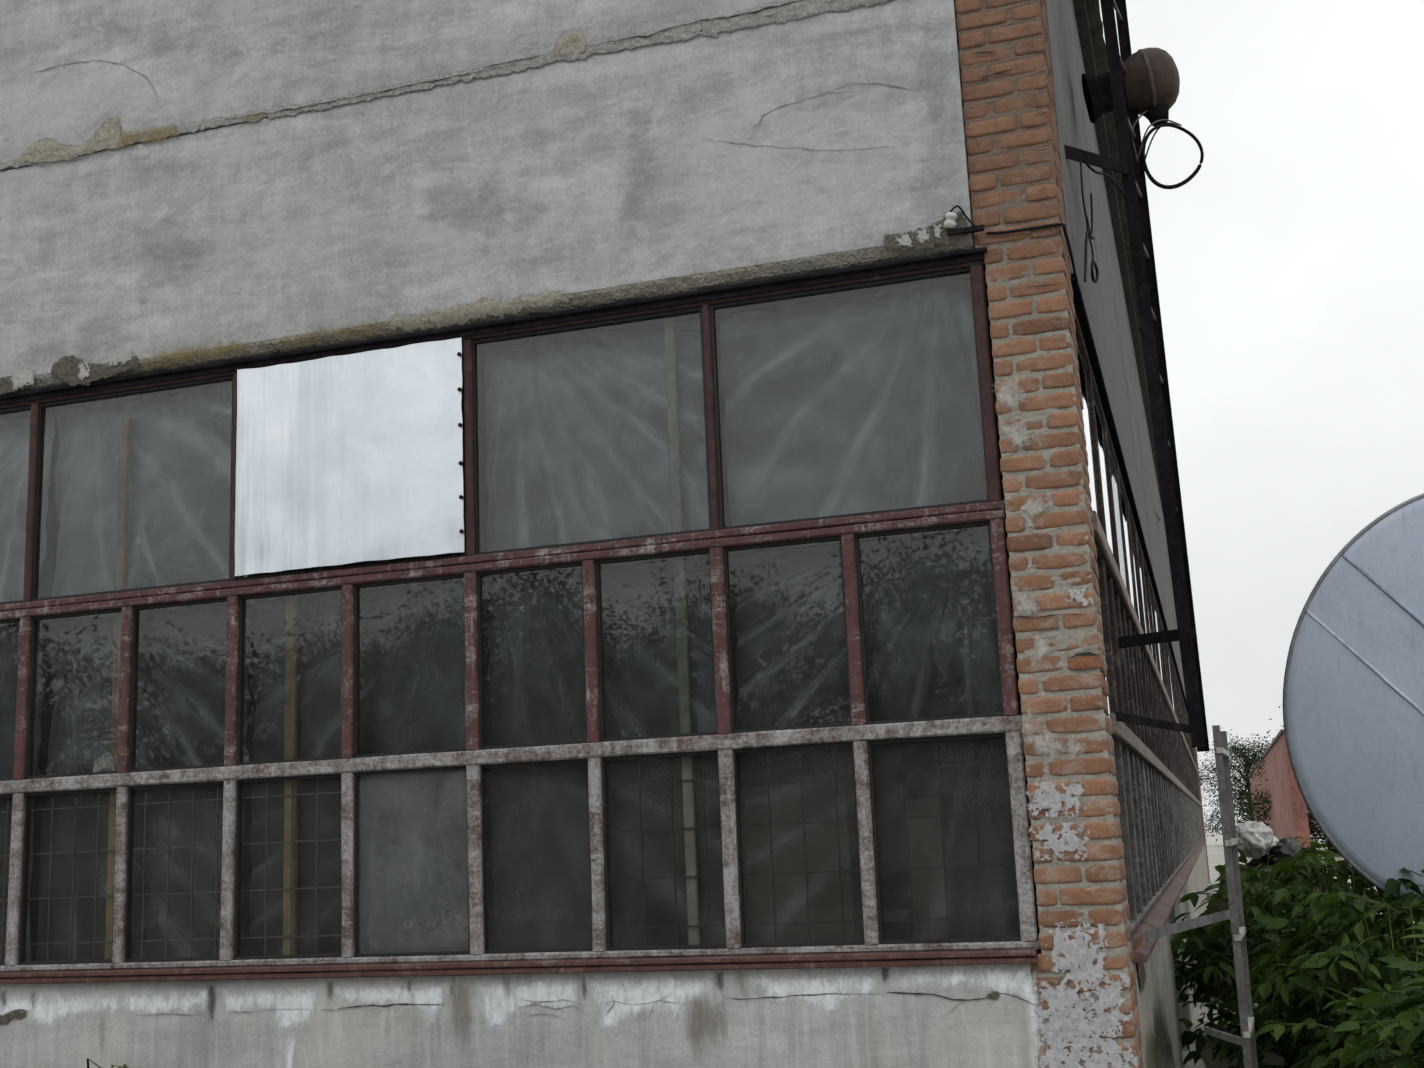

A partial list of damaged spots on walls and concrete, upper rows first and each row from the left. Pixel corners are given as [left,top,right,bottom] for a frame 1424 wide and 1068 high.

spalling [13,117,124,165]
crack [705,83,917,151]
spalling [883,210,967,251]
spalling [380,289,569,334]
spalling [0,367,34,395]
spalling [51,348,138,386]
peeling [1026,780,1094,864]
damp [0,984,443,1068]
damp [481,973,722,1028]
crack [727,991,1036,1016]
damp [755,968,1041,1056]
peeling [1032,919,1146,1068]